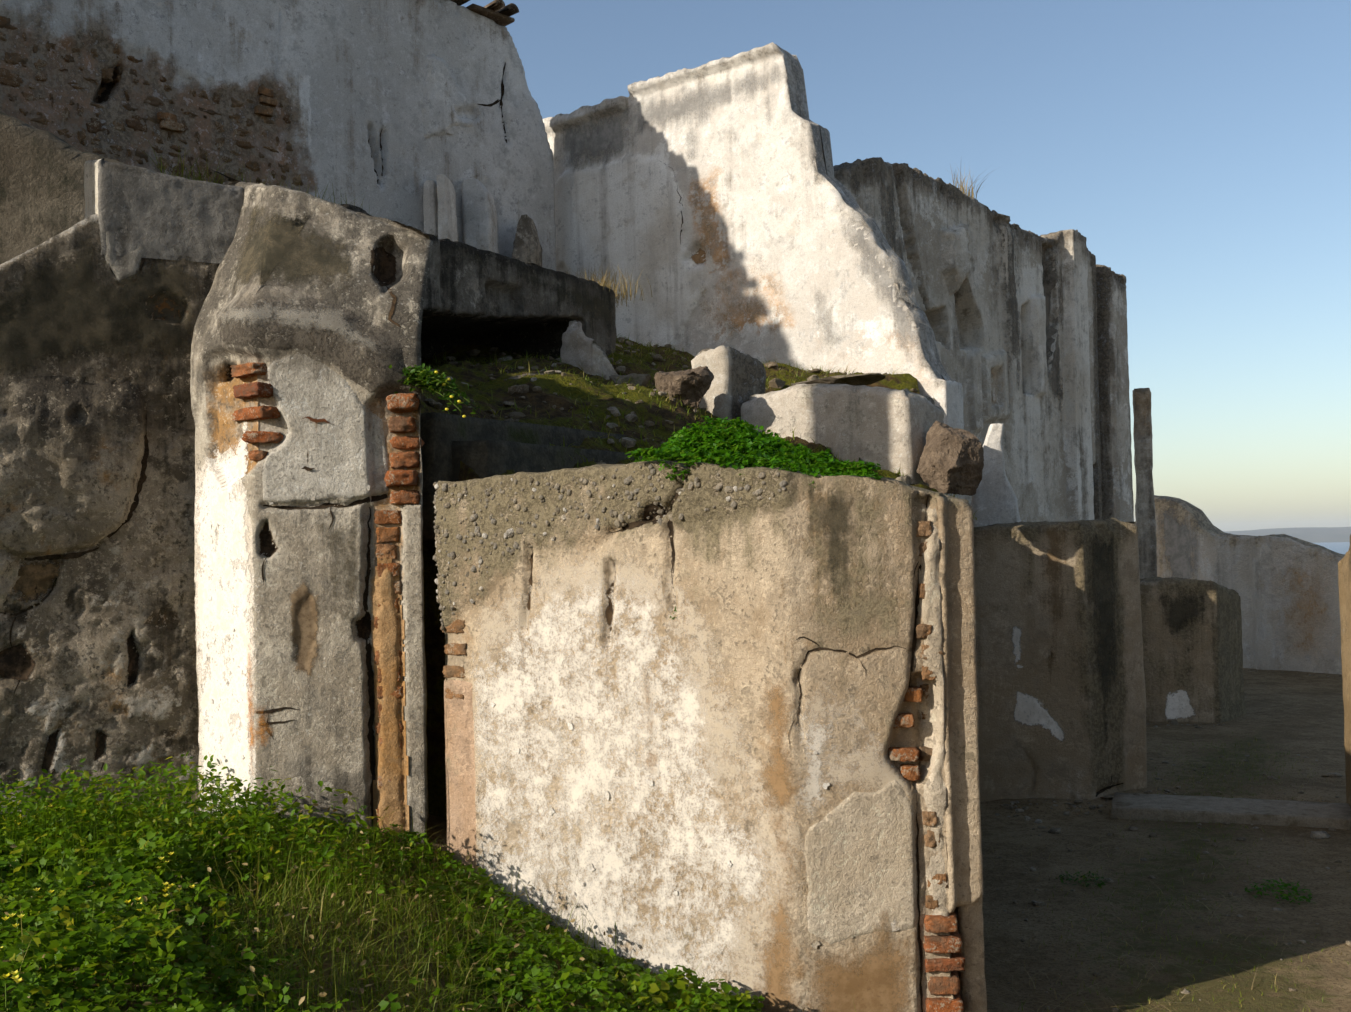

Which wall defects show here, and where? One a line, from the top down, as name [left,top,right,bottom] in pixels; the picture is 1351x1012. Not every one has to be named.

peeling [194,345,965,1012]
crack [788,561,922,746]
peeling [1014,691,1064,741]
crack [915,794,923,1012]